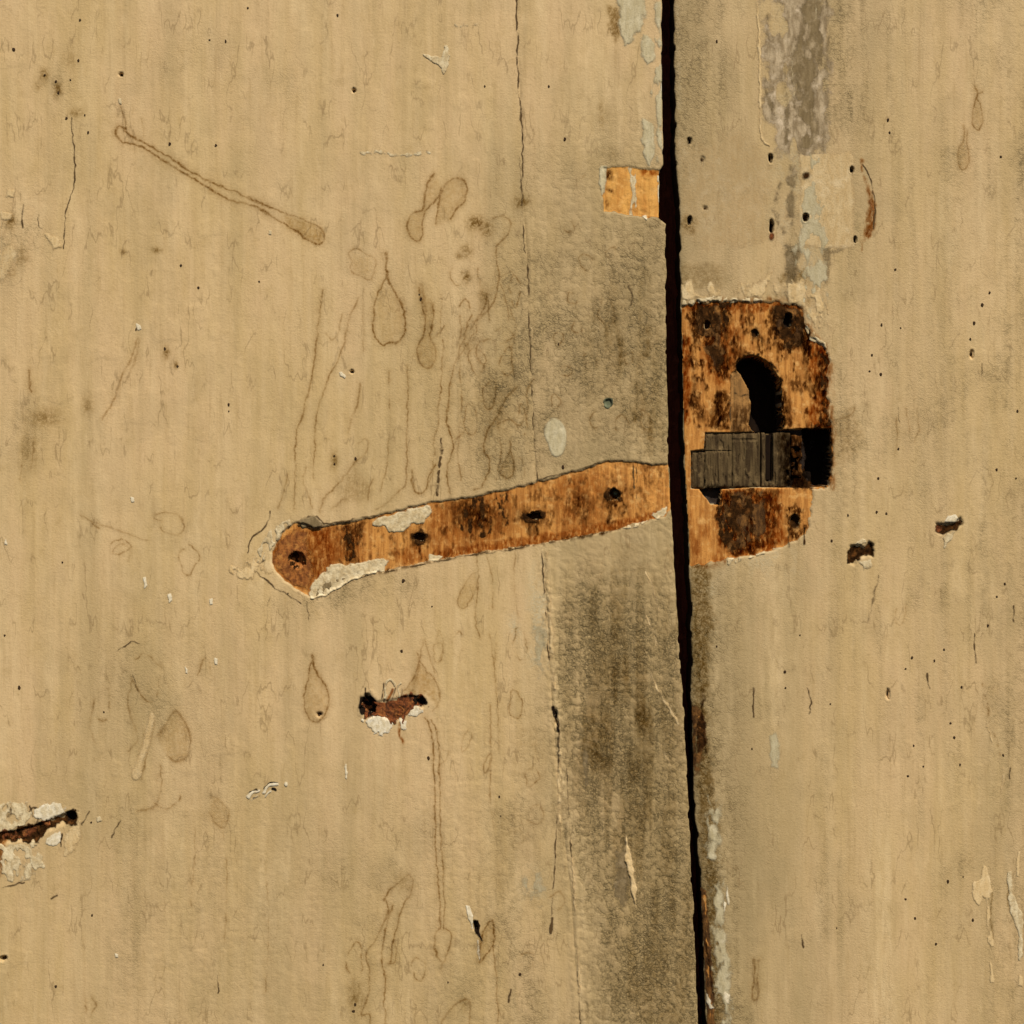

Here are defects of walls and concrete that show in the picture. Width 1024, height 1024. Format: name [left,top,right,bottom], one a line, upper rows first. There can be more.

peeling [599,0,663,220]
peeling [756,0,834,156]
crack [515,0,535,441]
spalling [847,538,874,569]
spalling [936,514,962,548]
spalling [359,696,376,716]
spalling [0,801,102,886]
damp [615,849,629,906]